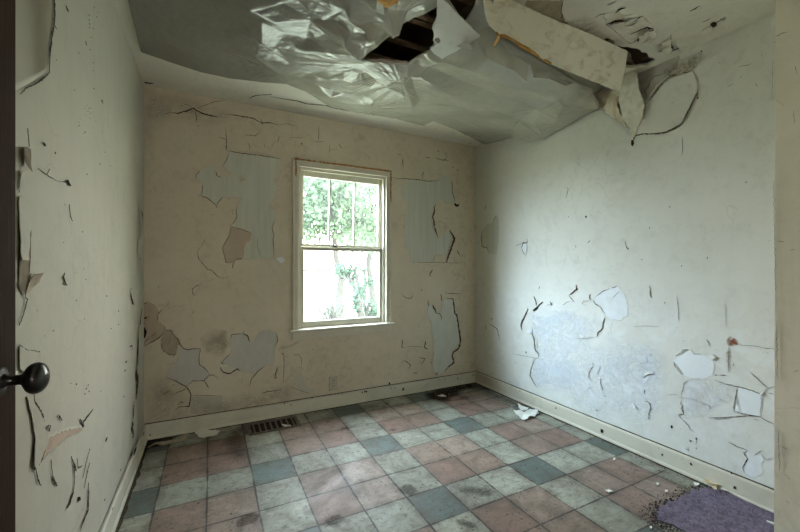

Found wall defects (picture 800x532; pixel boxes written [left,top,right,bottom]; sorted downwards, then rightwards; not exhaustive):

peeling [523,0,570,25]
crack [165,94,350,151]
peeling [18,128,44,325]
peeling [222,226,252,268]
peeling [19,345,41,372]
peeling [427,296,461,380]
peeling [537,285,656,419]
peeling [669,348,764,417]
peeling [27,394,93,470]
crack [36,449,90,531]
peeling [729,442,770,478]